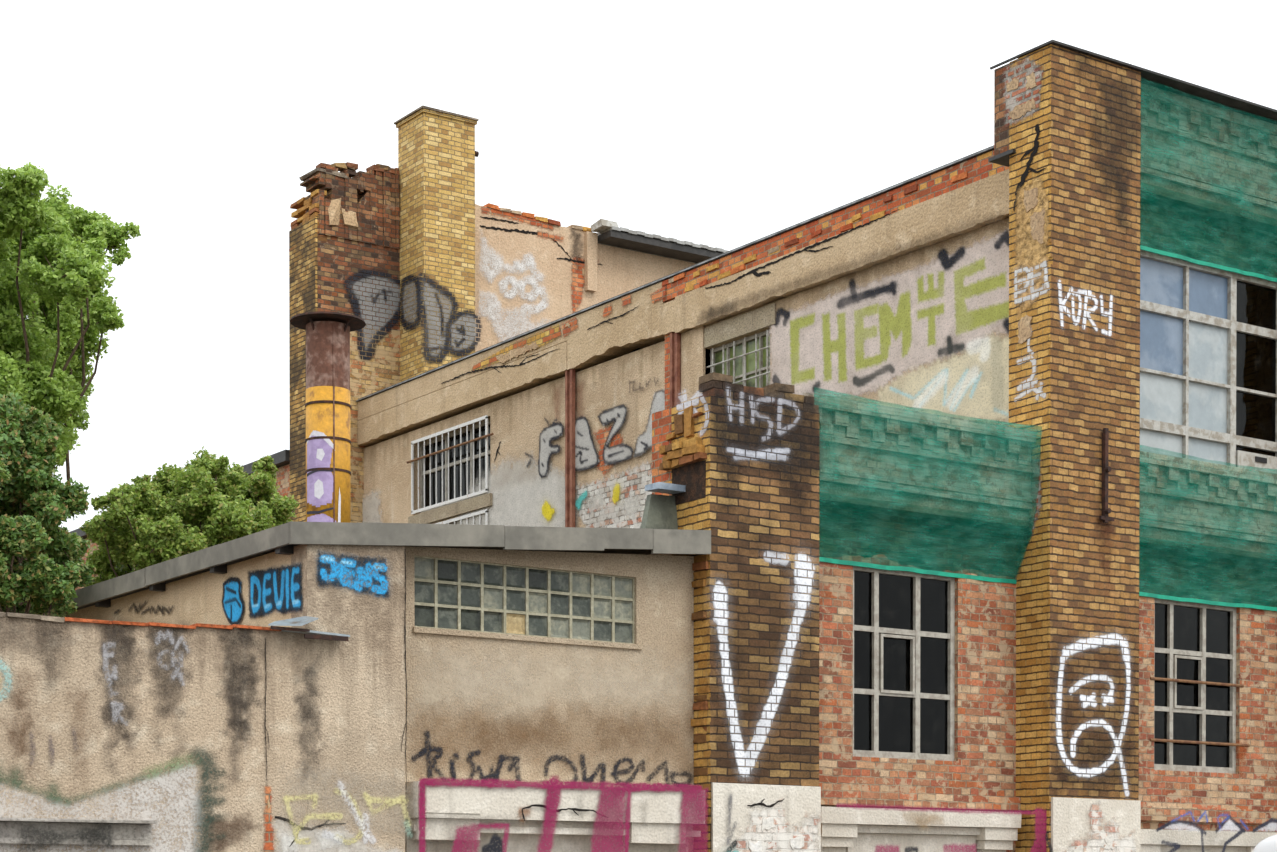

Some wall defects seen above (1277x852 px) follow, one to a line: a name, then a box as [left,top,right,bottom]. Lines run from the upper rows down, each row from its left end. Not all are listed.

flaking render [1004,58,1043,125]
crack [1013,124,1047,211]
crack [480,216,602,265]
crack [705,209,900,289]
flaking render [575,426,652,528]
water stain [228,663,254,733]